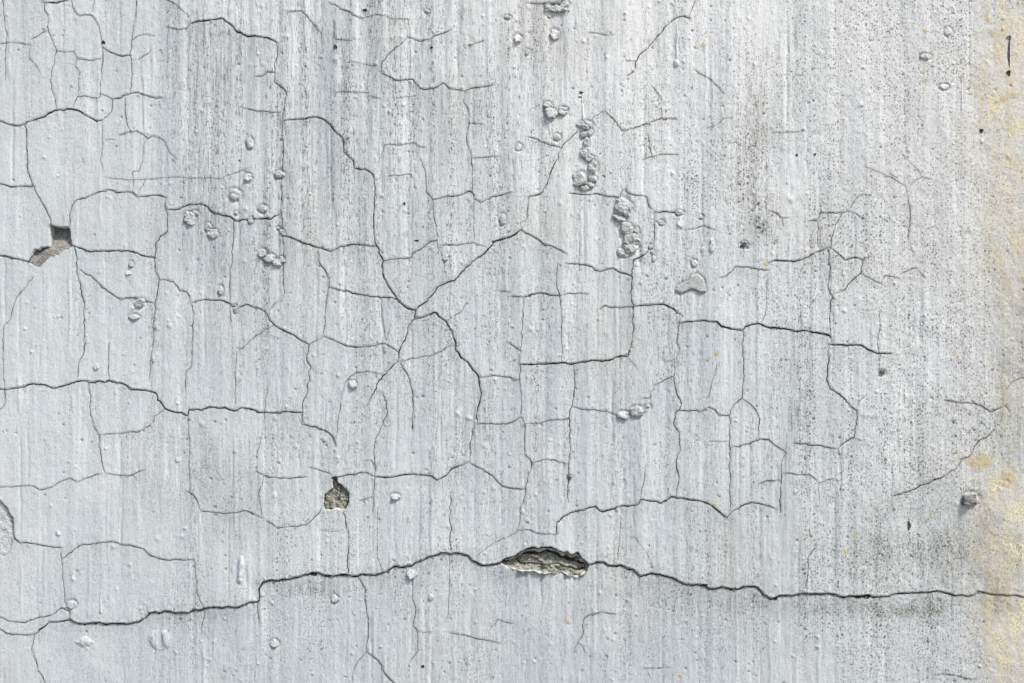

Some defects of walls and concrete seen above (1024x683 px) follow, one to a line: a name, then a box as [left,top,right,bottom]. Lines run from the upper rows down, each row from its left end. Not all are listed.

crack [1,0,162,189]
crack [167,0,339,189]
crack [381,37,509,226]
crack [594,1,695,159]
spalling [28,226,72,267]
spalling [324,477,349,509]
crack [1,131,930,682]
spalling [502,546,589,578]
crack [589,536,1024,601]
crack [894,377,1024,496]